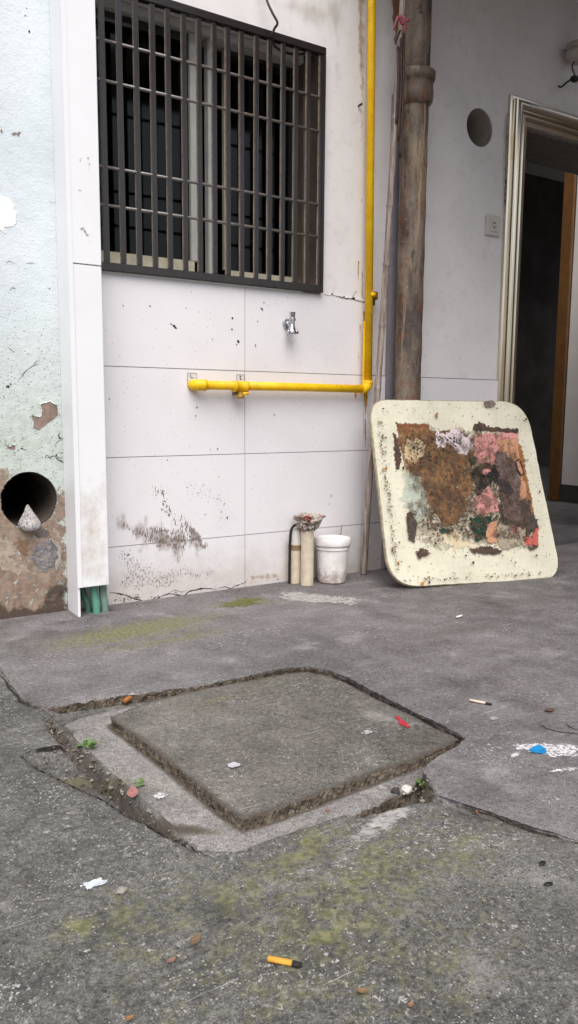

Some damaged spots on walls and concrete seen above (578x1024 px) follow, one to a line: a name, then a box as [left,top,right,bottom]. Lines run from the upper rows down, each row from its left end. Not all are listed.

peeling [0,195,17,233]
peeling [30,400,58,430]
flaking render [0,468,68,613]
water stain [123,488,206,555]
crack [110,582,245,601]
crack [435,793,577,841]